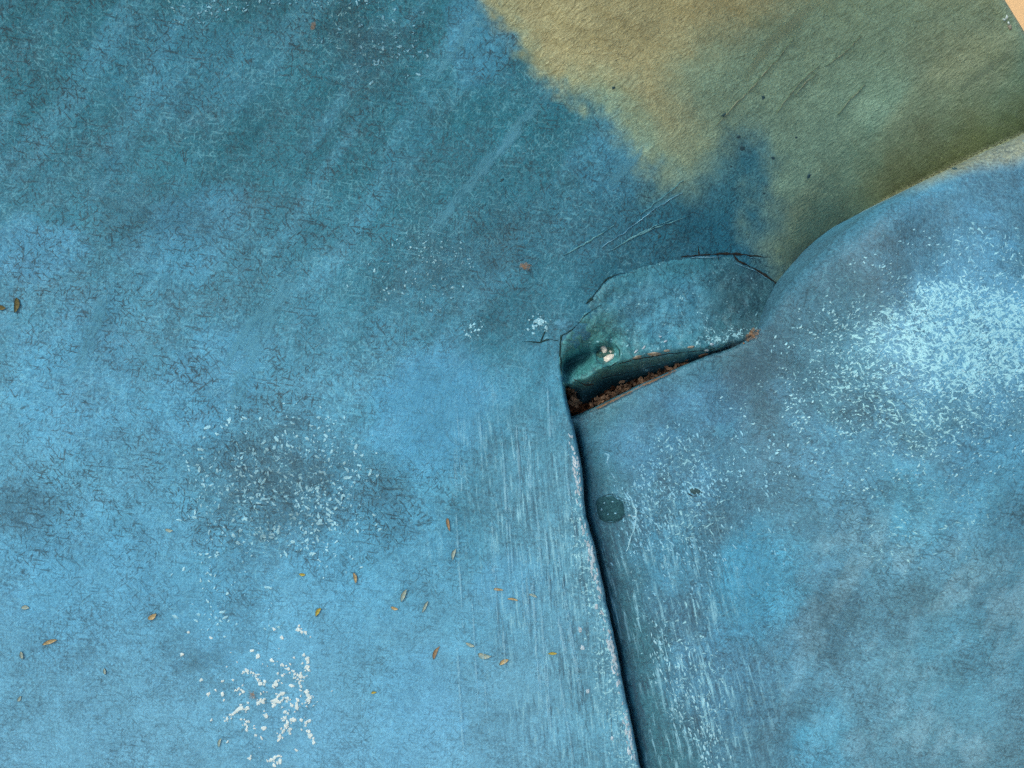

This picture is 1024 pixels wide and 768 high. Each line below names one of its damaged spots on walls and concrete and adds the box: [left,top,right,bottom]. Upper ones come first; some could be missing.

crack [681,246,777,284]
crack [525,273,624,374]